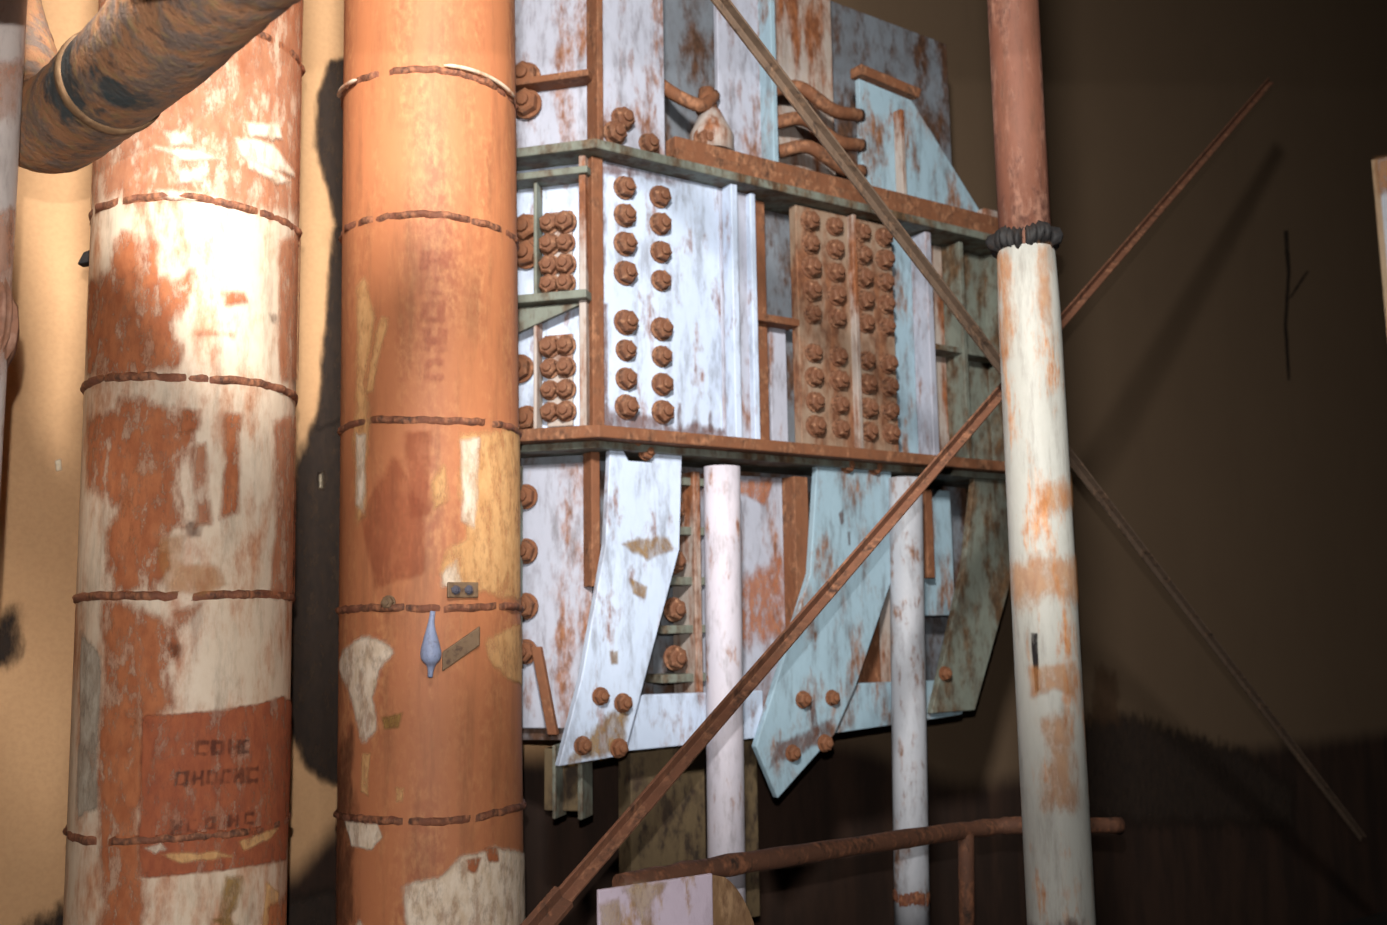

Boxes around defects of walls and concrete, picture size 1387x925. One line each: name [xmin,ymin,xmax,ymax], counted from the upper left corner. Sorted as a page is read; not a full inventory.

rust [91,0,303,215]
rust [87,232,192,376]
rust [226,292,247,304]
rust [279,237,301,379]
rust [77,397,241,925]
rust [270,416,296,600]
peeling [339,637,401,795]
rust [531,647,559,735]
rust [624,537,672,559]
rust [742,558,784,642]
peeling [346,821,382,850]
peeling [404,847,525,925]